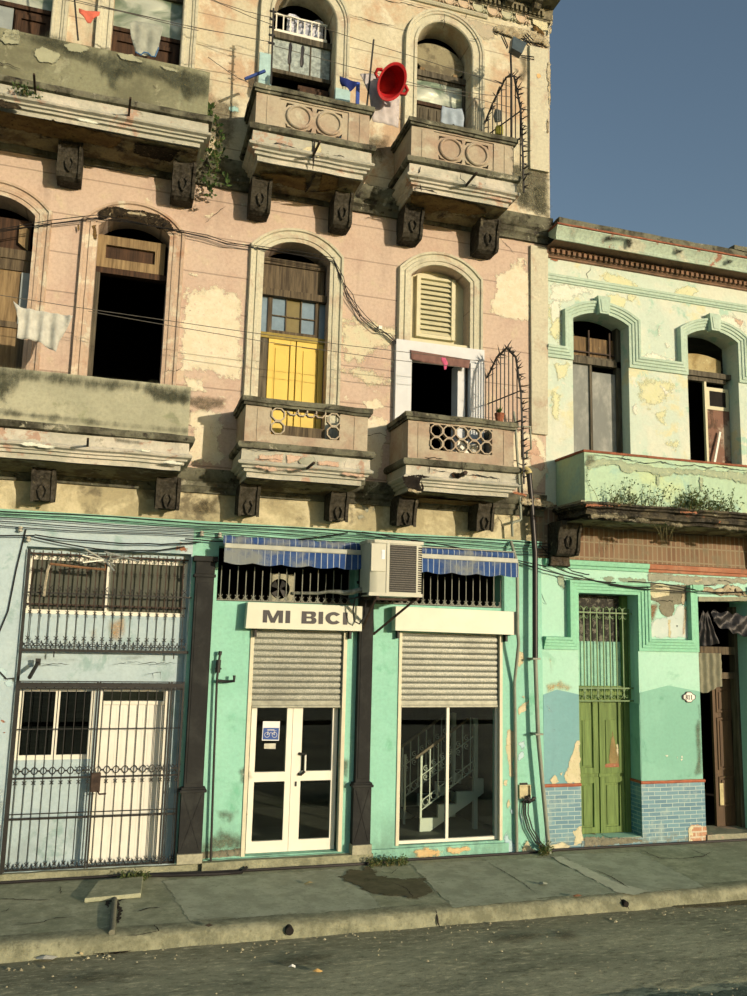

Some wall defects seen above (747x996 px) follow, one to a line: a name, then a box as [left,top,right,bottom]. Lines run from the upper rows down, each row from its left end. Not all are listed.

peeling [34,43,89,63]
leakage [33,37,207,98]
leakage [514,165,549,217]
peeling [490,257,530,321]
peeling [180,273,244,393]
leakage [0,368,123,399]
leakage [136,384,222,409]
peeling [163,409,226,466]
peeling [513,431,554,517]
peeling [557,573,747,639]
peeling [550,741,581,784]
peeling [414,846,470,858]